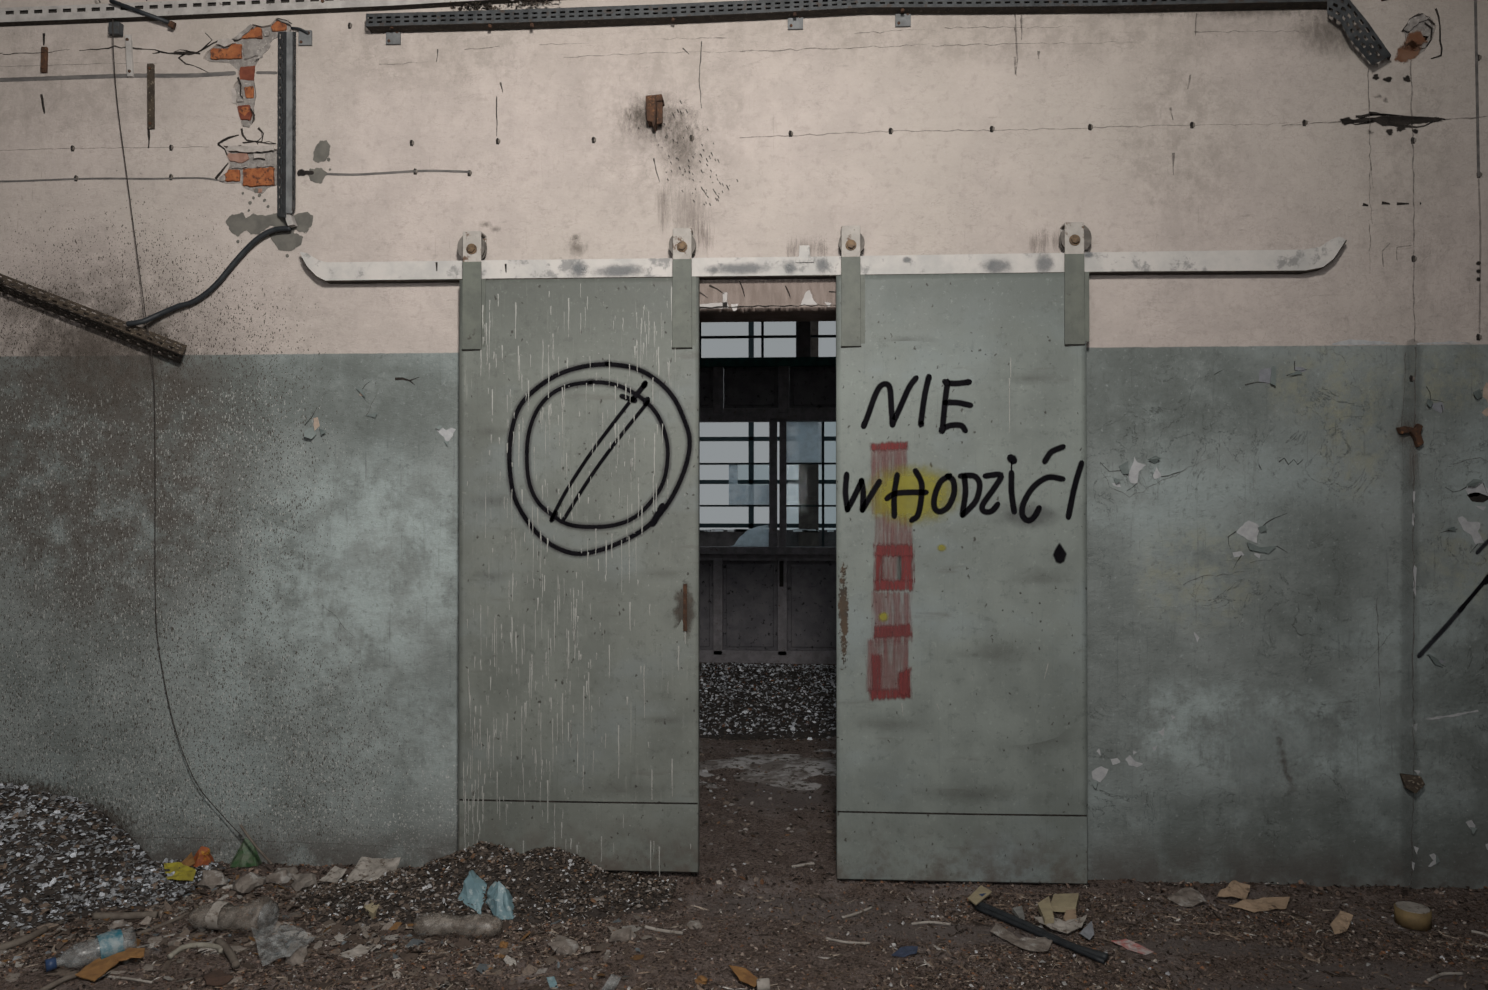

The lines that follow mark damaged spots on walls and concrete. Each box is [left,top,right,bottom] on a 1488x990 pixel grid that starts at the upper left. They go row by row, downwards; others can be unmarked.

spalling [1394,8,1443,62]
spalling [174,18,292,194]
peeling [1228,513,1287,567]
peeling [1441,479,1488,553]